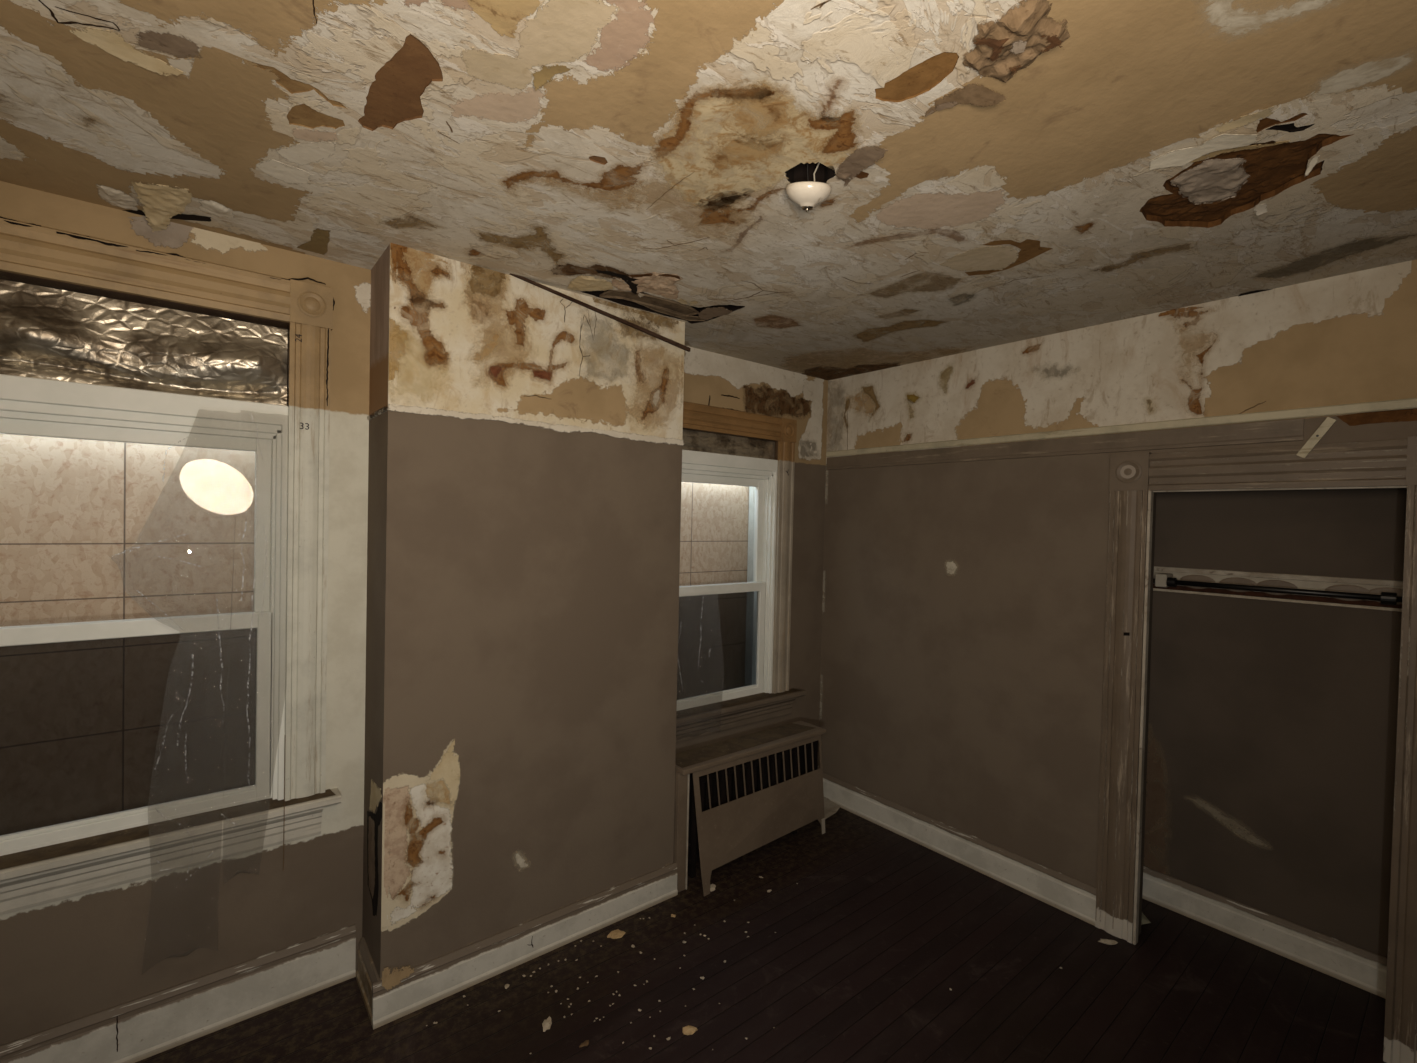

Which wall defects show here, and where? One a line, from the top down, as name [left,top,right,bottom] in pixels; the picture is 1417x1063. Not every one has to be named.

peeling [0,0,784,255]
leakage [502,80,858,225]
peeling [836,0,1417,276]
flaking render [354,282,371,313]
peeling [389,318,409,380]
flaking render [826,260,1412,464]
flaking render [367,779,454,927]